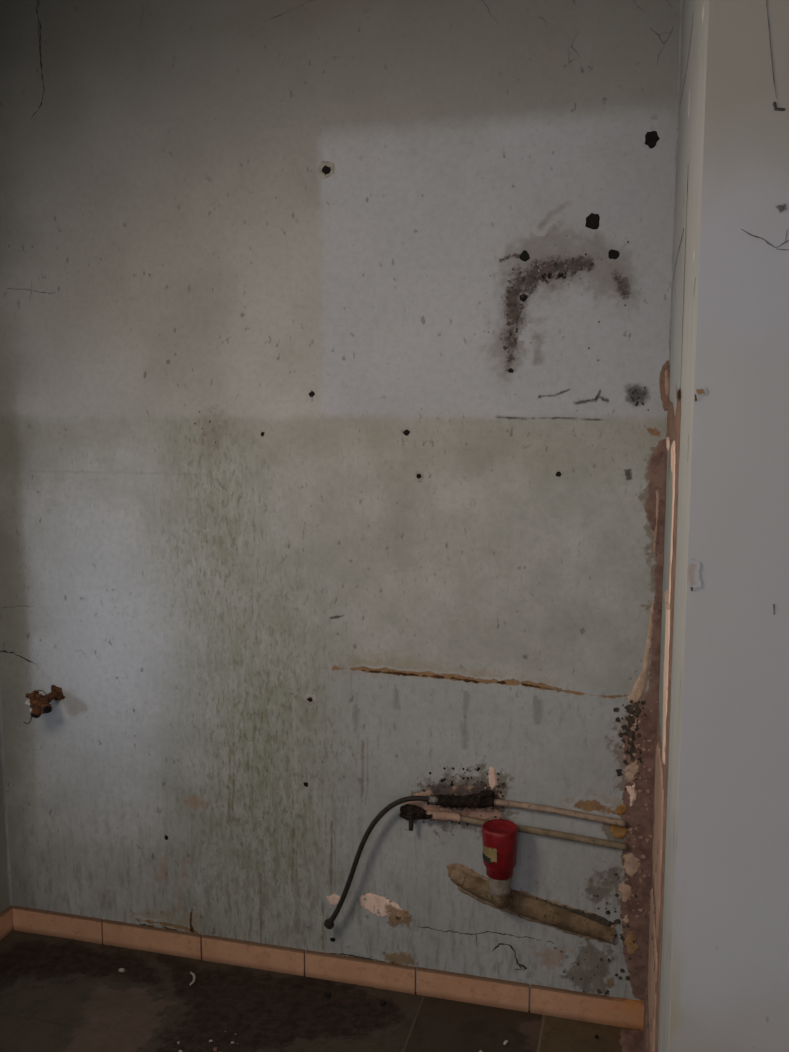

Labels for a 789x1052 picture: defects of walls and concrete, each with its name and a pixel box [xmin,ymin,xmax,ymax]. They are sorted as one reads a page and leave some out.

crack [32,0,45,117]
mould [463,196,663,409]
spalling [598,360,689,1052]
spalling [387,752,529,846]
peeling [360,892,411,930]
damp [572,853,626,922]
damp [516,938,625,997]